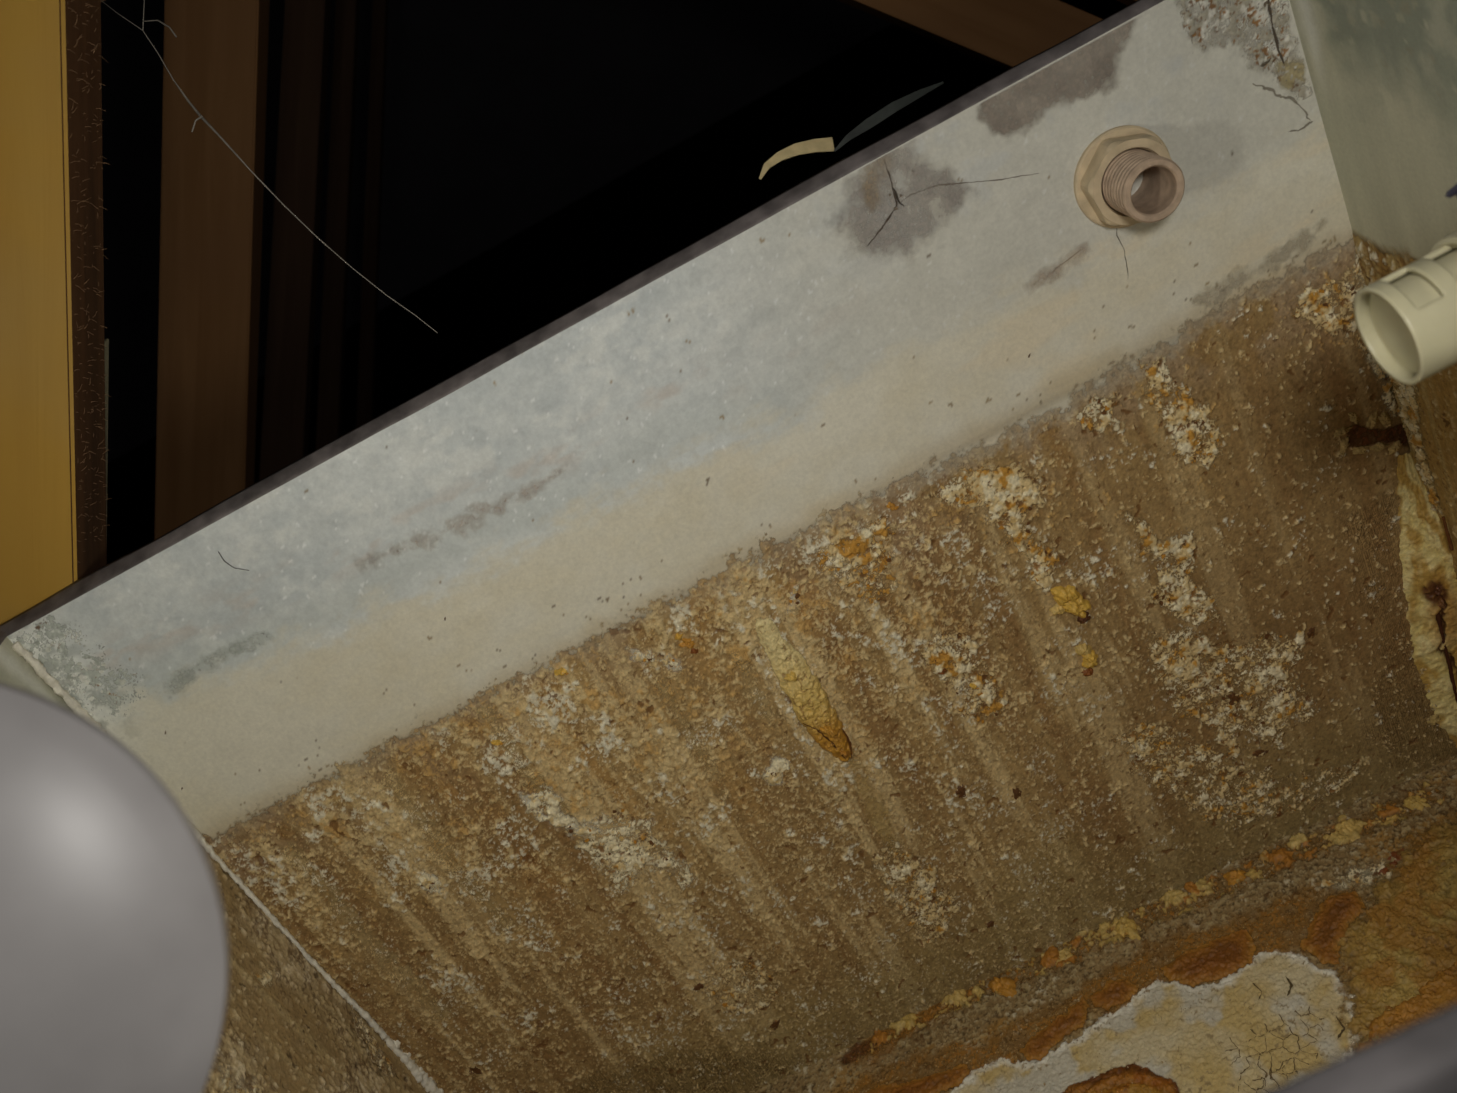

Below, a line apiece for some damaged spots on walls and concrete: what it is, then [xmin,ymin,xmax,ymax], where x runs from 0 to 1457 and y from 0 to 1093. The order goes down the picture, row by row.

crack [868,159,1039,245]